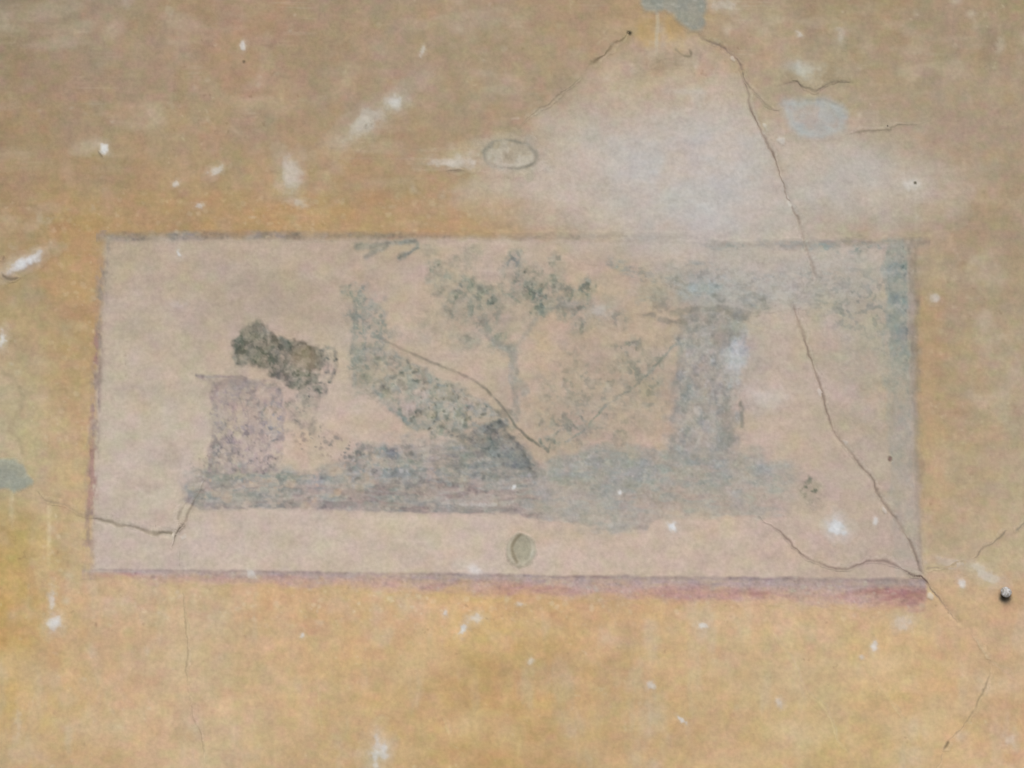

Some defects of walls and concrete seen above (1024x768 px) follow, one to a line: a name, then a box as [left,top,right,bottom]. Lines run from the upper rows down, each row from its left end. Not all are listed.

crack [519,32,629,128]
crack [700,36,1024,768]
crack [36,478,207,566]